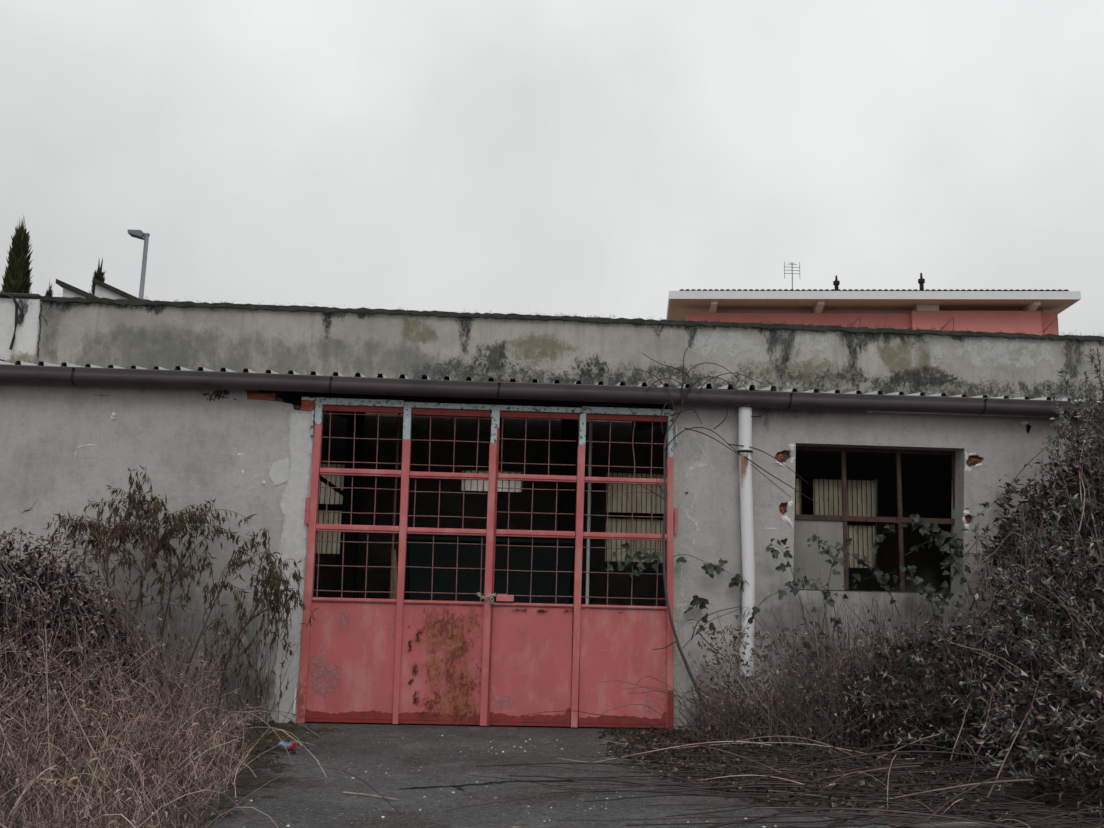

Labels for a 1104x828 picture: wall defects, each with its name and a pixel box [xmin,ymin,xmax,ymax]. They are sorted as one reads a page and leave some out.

leakage [18,298,28,325]
leakage [114,299,176,314]
leakage [412,312,1096,399]
spalling [245,390,316,411]
spalling [775,444,795,467]
spalling [965,451,983,472]
corrosion [419,605,482,722]